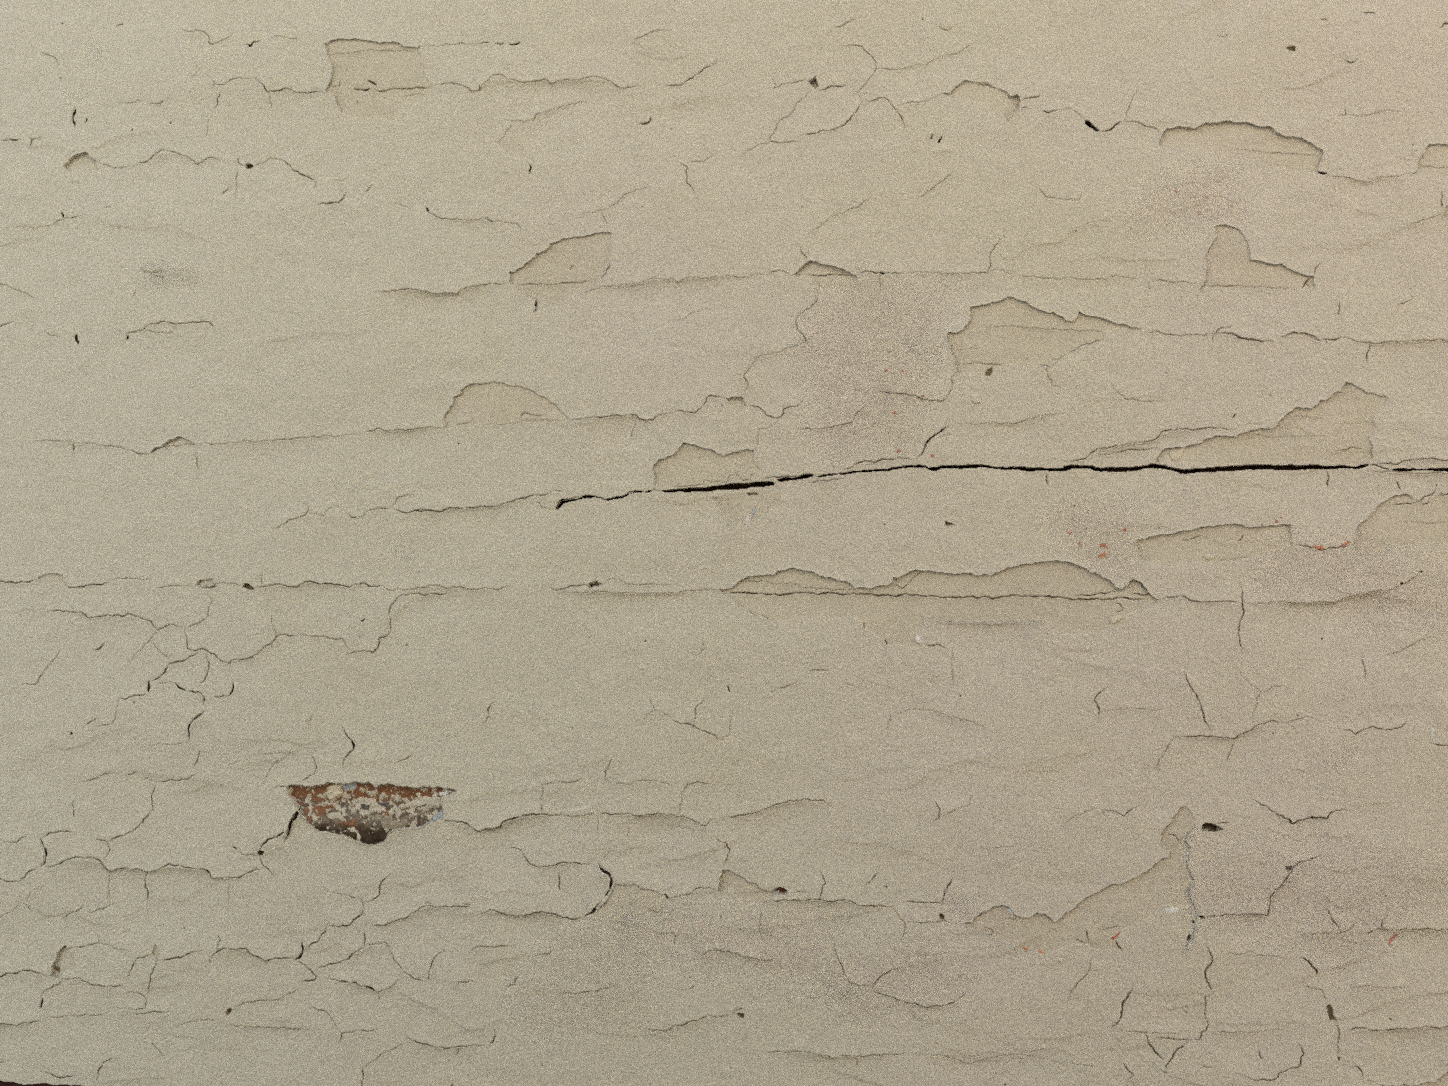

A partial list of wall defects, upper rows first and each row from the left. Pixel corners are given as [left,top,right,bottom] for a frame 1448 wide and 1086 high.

peeling [506,230,612,314]
peeling [945,294,1141,377]
peeling [1153,380,1389,467]
crack [272,458,1448,529]
peeling [1134,522,1293,566]
peeling [717,558,1160,649]
spalling [283,782,457,845]
crack [0,577,830,1086]
crack [648,872,962,1032]